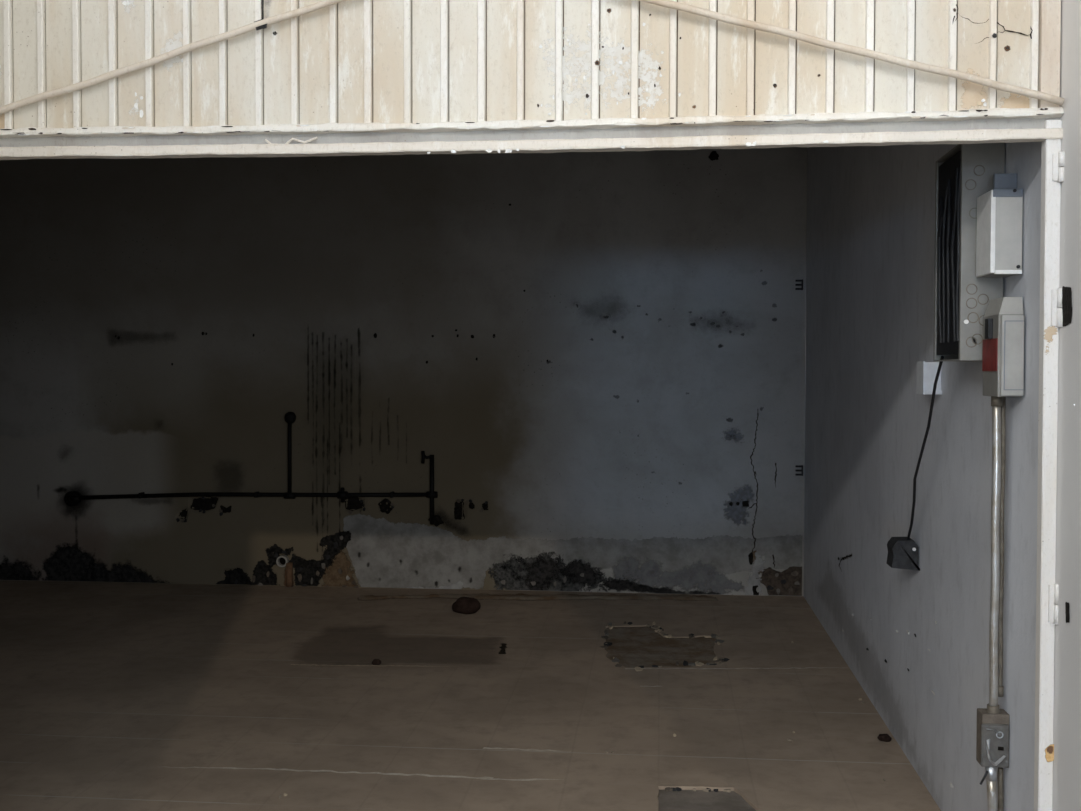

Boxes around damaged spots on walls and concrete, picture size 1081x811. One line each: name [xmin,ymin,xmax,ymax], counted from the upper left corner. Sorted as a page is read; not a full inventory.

crack [953,4,1033,44]
crack [749,413,777,567]
peeling [216,530,369,588]
spalling [748,551,802,596]
peeling [600,621,730,671]
peeling [658,787,756,811]